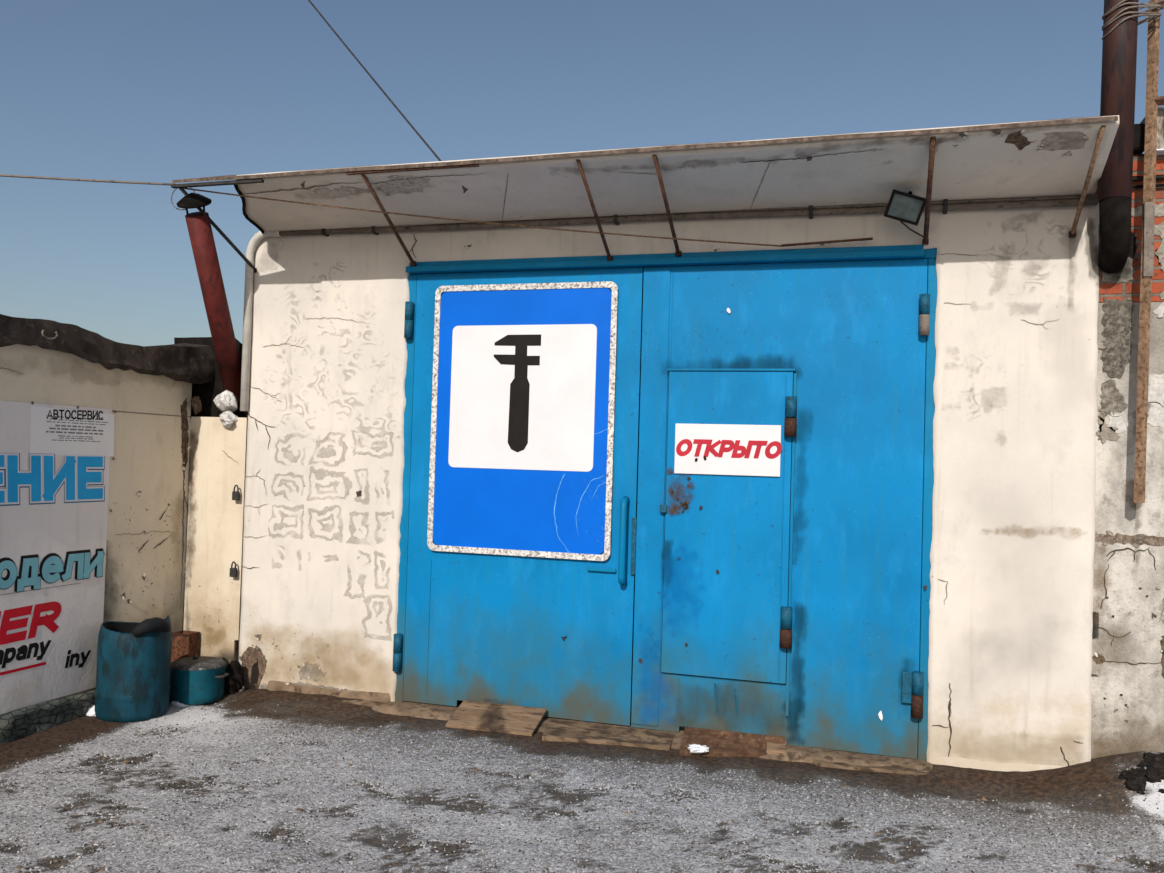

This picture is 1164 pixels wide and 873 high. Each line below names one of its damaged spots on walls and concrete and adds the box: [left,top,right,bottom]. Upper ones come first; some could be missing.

peeling [991,129,1089,158]
spalling [1152,301,1164,318]
spalling [1096,297,1135,443]
spalling [1147,374,1164,428]
crack [222,386,282,538]
corrosion [668,469,693,515]
crack [1096,547,1164,665]
crack [932,683,952,757]